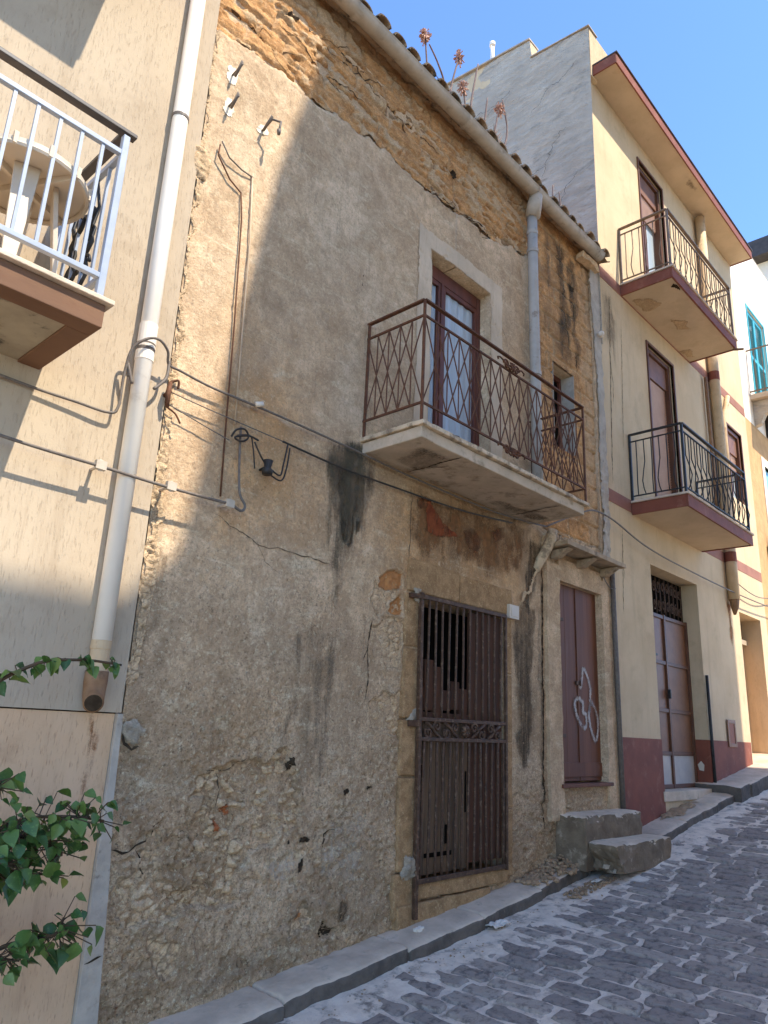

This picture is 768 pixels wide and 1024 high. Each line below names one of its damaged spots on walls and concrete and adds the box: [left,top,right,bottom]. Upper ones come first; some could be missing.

leakage [546,241,581,366]
crack [214,513,333,573]
leakage [327,442,374,568]
peeling [417,498,502,552]
crack [363,617,373,699]
flaking render [378,570,402,615]
leakage [412,498,547,768]